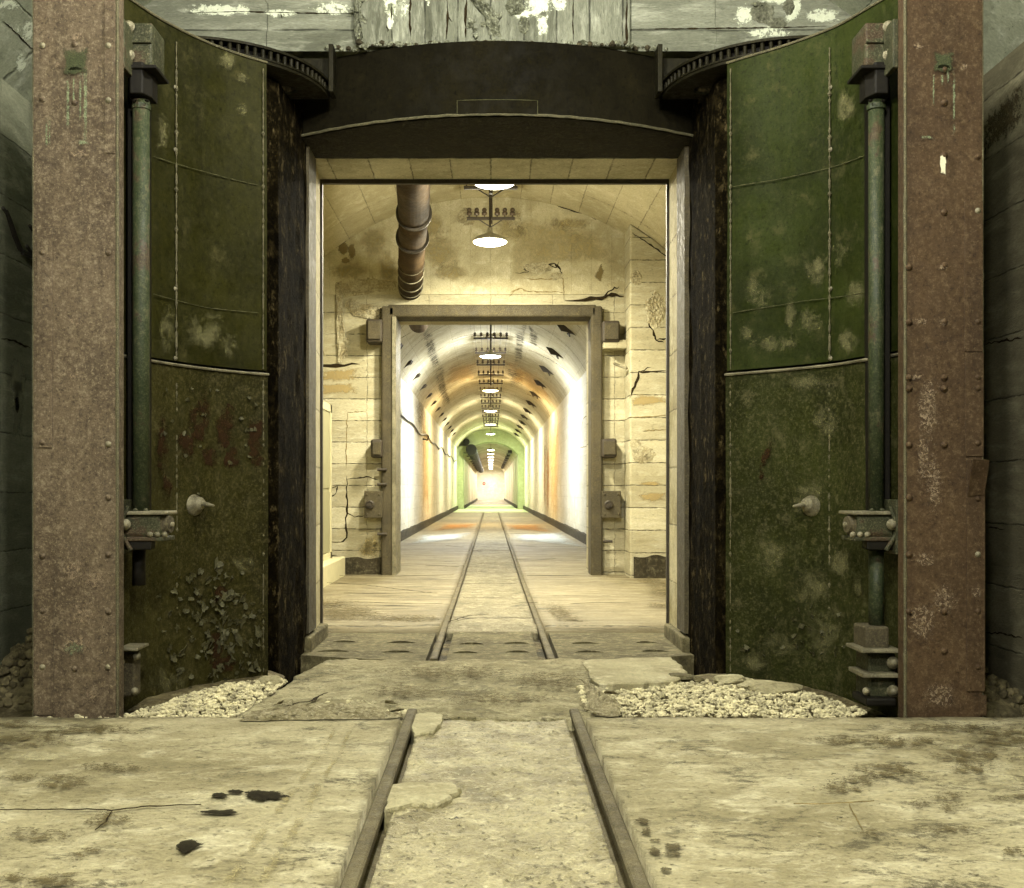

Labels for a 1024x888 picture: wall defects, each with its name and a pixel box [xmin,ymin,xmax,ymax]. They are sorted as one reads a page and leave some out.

spalling [324,0,459,52]
spalling [465,0,668,52]
crack [511,262,624,301]
crack [628,367,666,431]
crack [332,411,378,543]
peeling [156,557,263,689]